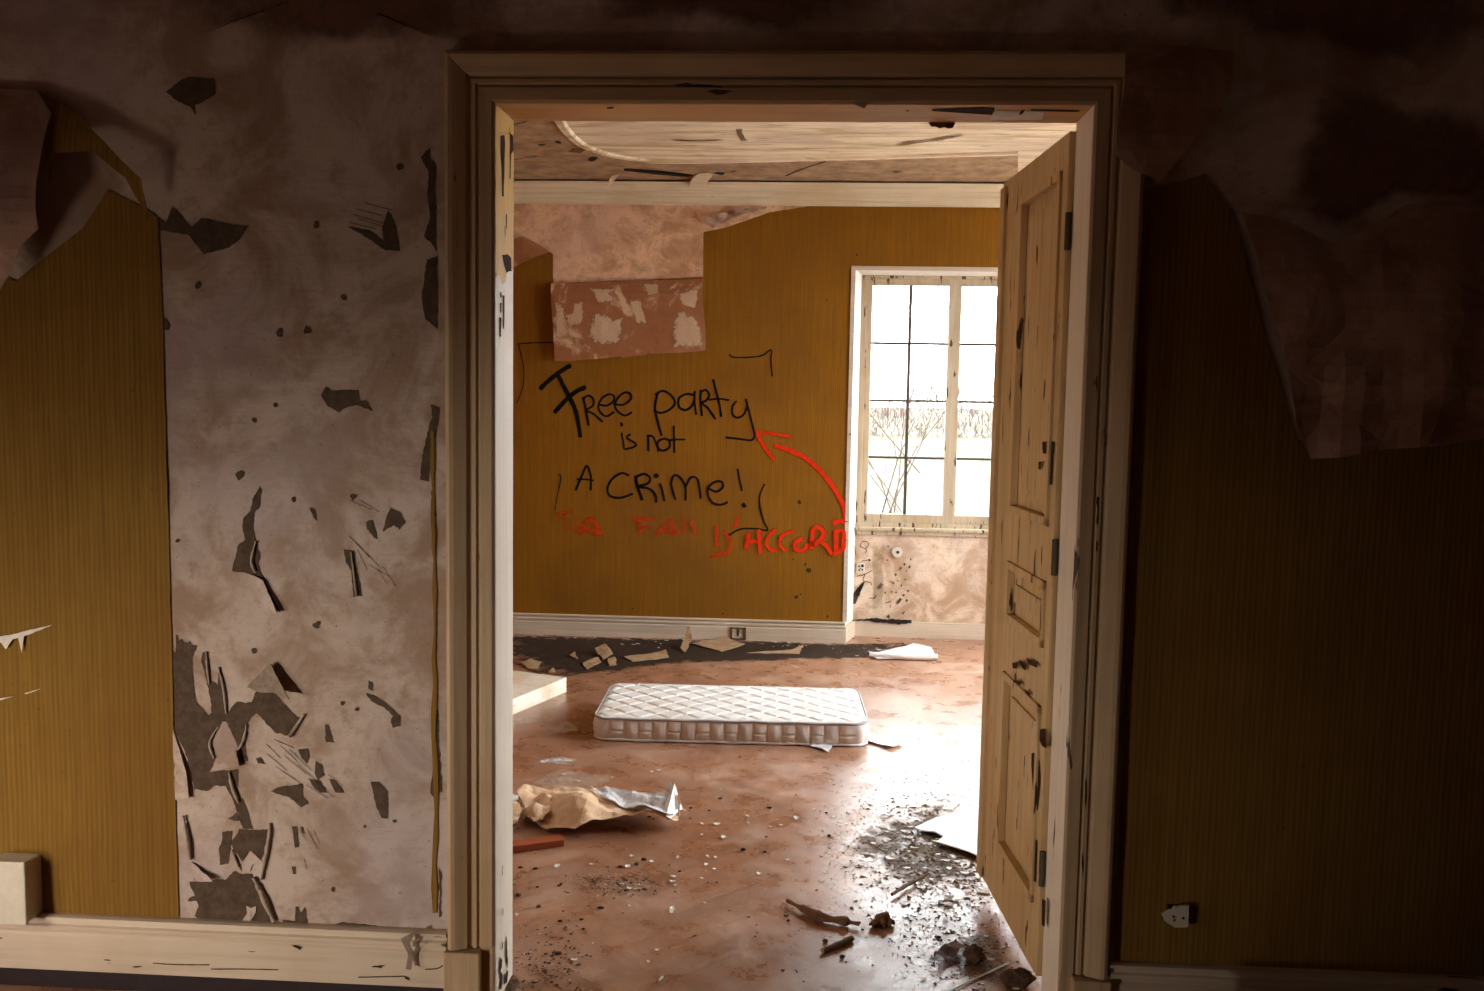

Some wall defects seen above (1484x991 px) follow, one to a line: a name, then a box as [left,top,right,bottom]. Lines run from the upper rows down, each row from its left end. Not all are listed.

flaking render [500,126,806,283]
flaking render [157,207,249,254]
flaking render [349,211,400,251]
flaking render [321,387,372,412]
flaking render [366,508,406,539]
flaking render [232,486,280,614]
flaking render [344,549,362,597]
flaking render [366,681,401,728]
flaking render [172,635,344,923]
flaking render [371,782,388,819]